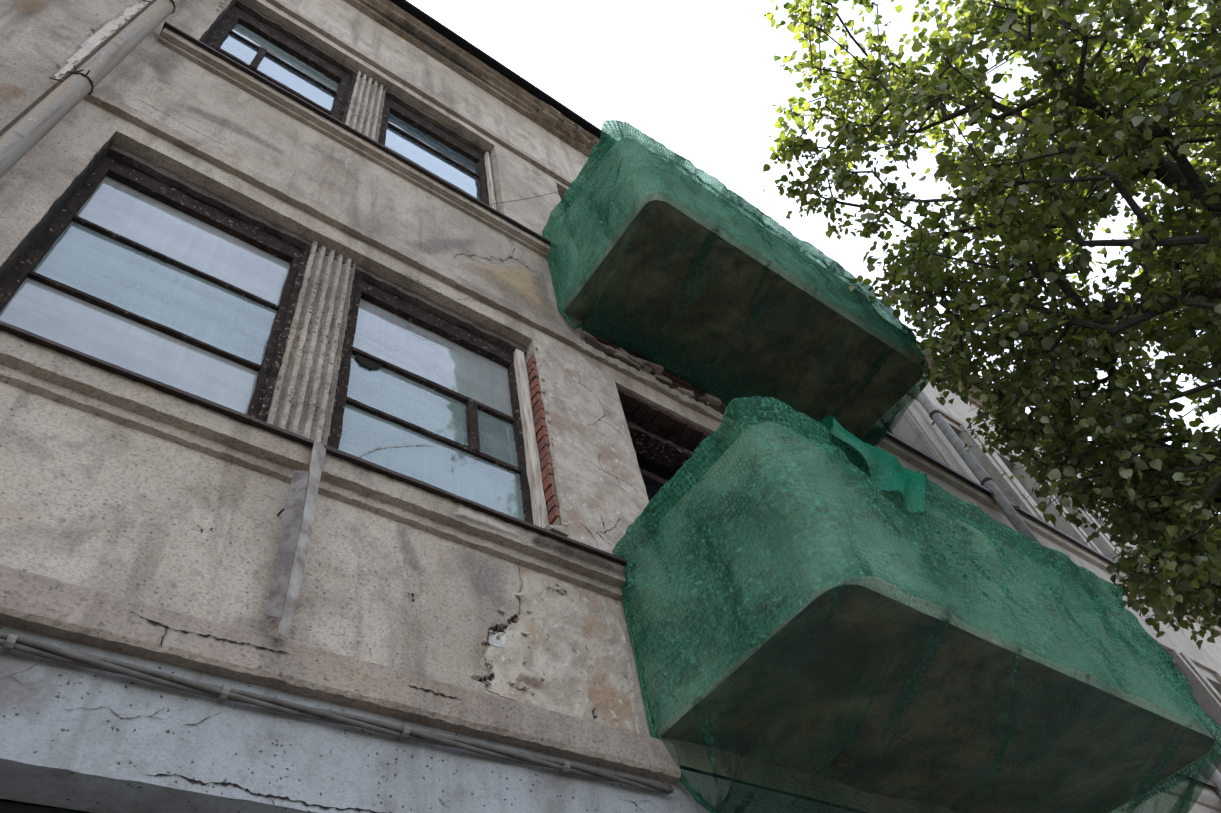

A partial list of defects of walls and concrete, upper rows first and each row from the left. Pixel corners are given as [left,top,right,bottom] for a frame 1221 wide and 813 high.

flaking render [54,1,148,79]
crack [132,612,297,656]
flaking render [479,565,637,733]
crack [146,774,392,813]